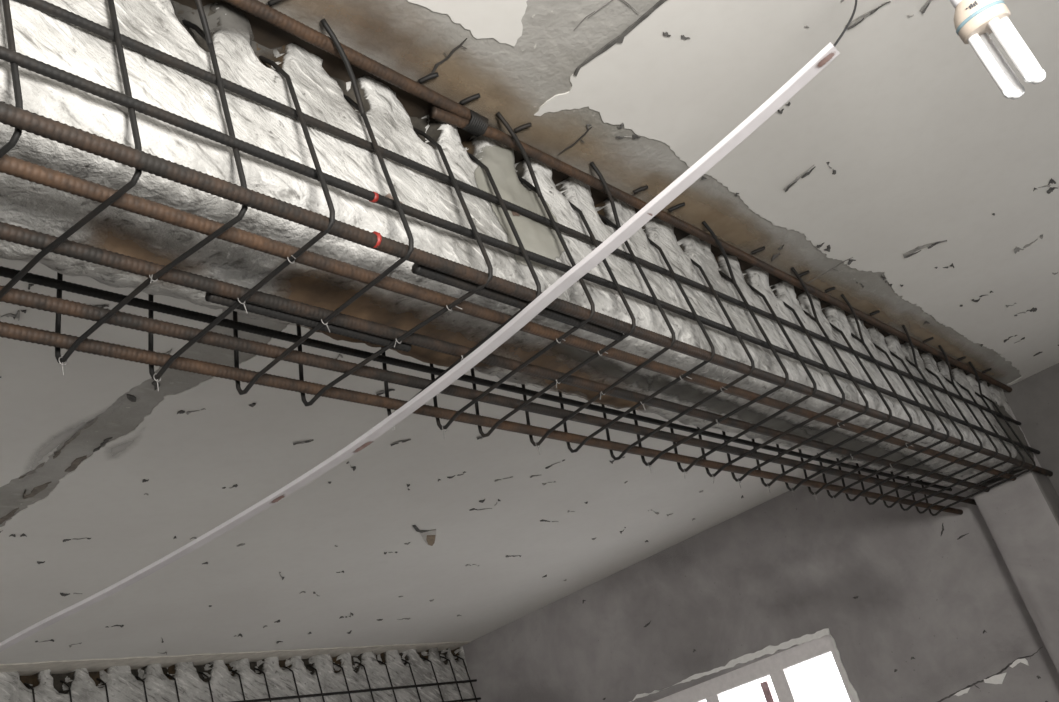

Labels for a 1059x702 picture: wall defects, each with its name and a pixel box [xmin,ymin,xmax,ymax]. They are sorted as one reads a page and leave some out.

peeling [845,1,891,30]
spalling [574,0,667,76]
peeling [783,162,836,192]
peeling [903,240,947,258]
spalling [65,437,113,472]
spalling [0,416,98,537]
peeling [412,525,436,546]
crack [937,647,1042,702]